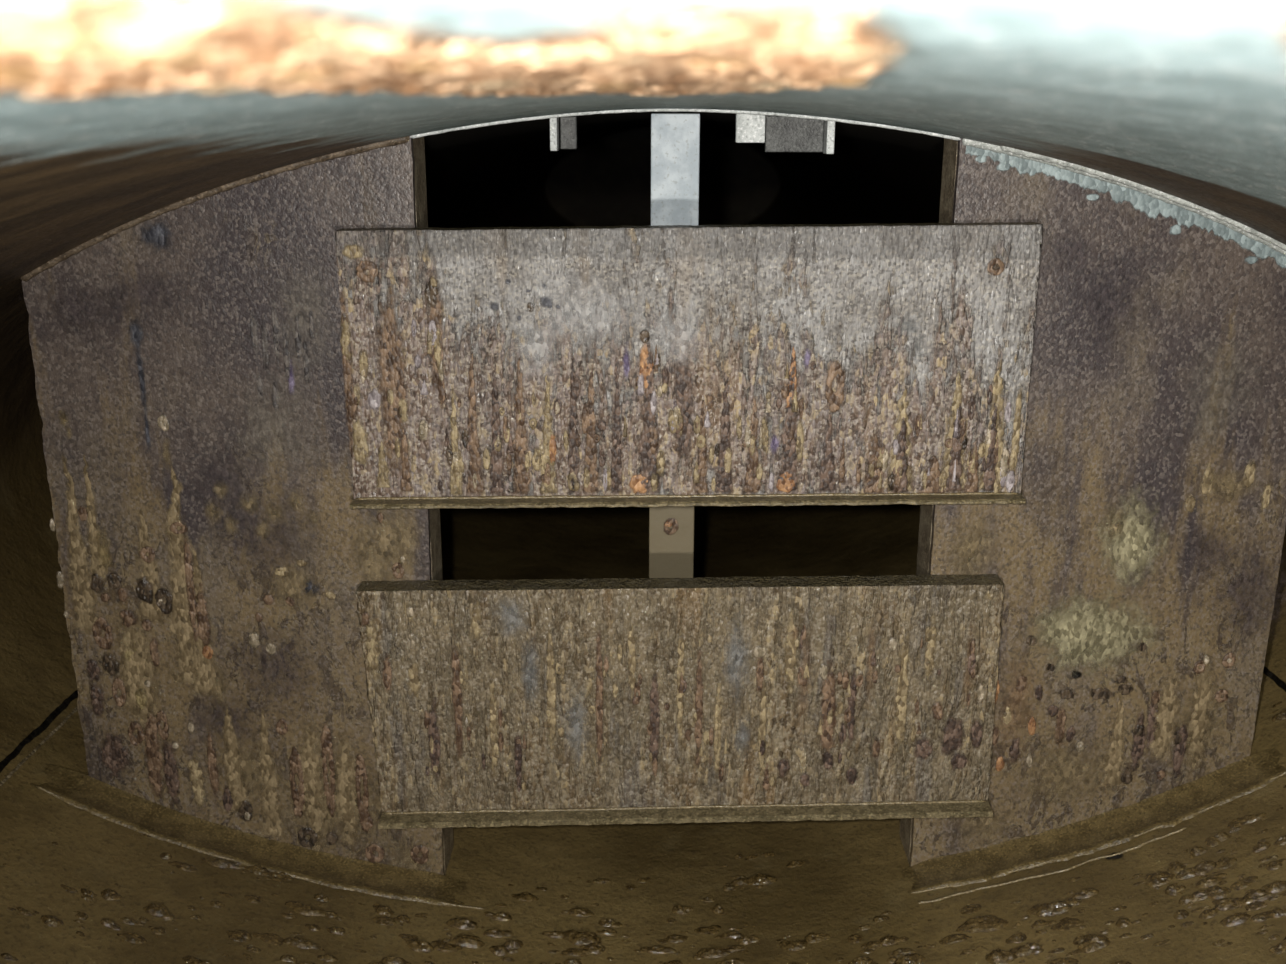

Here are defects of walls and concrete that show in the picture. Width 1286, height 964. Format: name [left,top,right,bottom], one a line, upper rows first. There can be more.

corrosion [987,258,1005,276]
peeling [965,146,1286,268]
corrosion [414,277,1022,495]
leakage [1108,502,1155,578]
corrosion [49,448,429,869]
corrosion [482,674,527,792]
corrosion [546,633,565,749]
corrosion [588,625,727,782]
corrosion [784,612,941,763]
corrosion [1048,689,1085,752]
leakage [1026,604,1150,679]
corrosion [1091,653,1236,786]